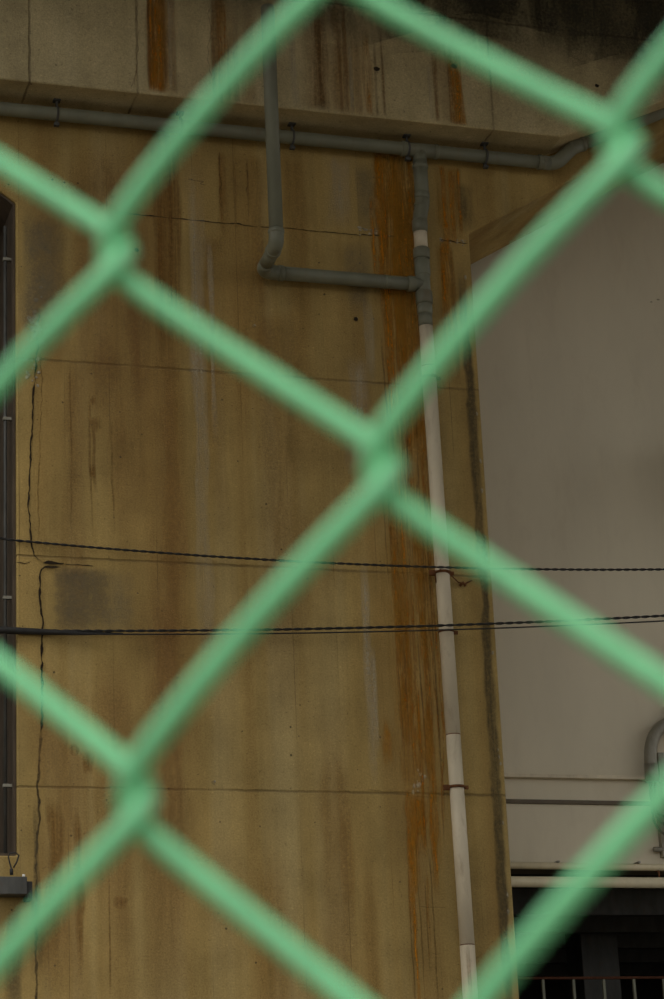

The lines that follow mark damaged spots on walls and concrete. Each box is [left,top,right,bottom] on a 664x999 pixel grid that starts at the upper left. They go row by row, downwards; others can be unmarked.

crack [17,360,92,685]
crack [35,712,44,904]
crack [32,937,40,999]